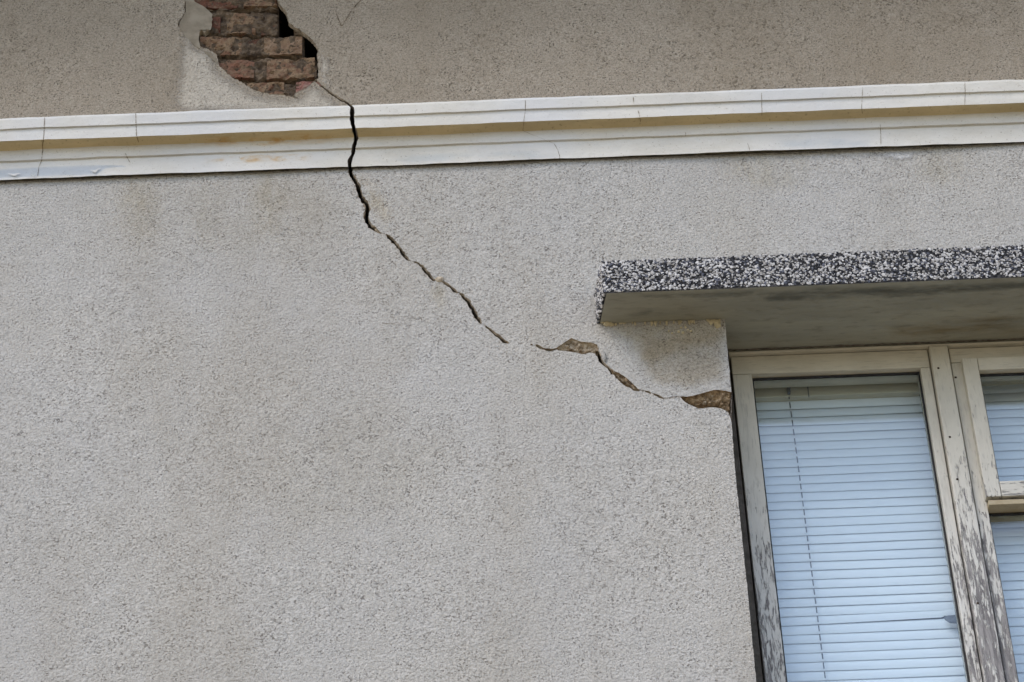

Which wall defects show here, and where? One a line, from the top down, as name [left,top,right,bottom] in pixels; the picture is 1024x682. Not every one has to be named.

spalling [179,0,321,99]
crack [314,79,559,351]
crack [595,351,678,399]